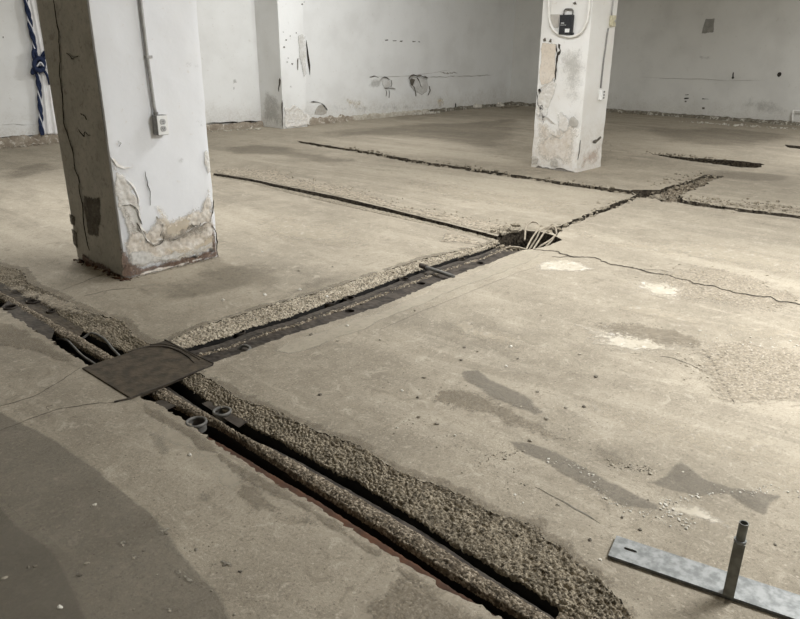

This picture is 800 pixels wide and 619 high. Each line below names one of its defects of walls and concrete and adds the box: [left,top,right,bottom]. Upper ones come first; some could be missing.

crack [0,0,89,249]
flaking render [36,0,215,277]
peeling [536,38,578,167]
rust [82,225,217,277]
crack [380,248,800,330]